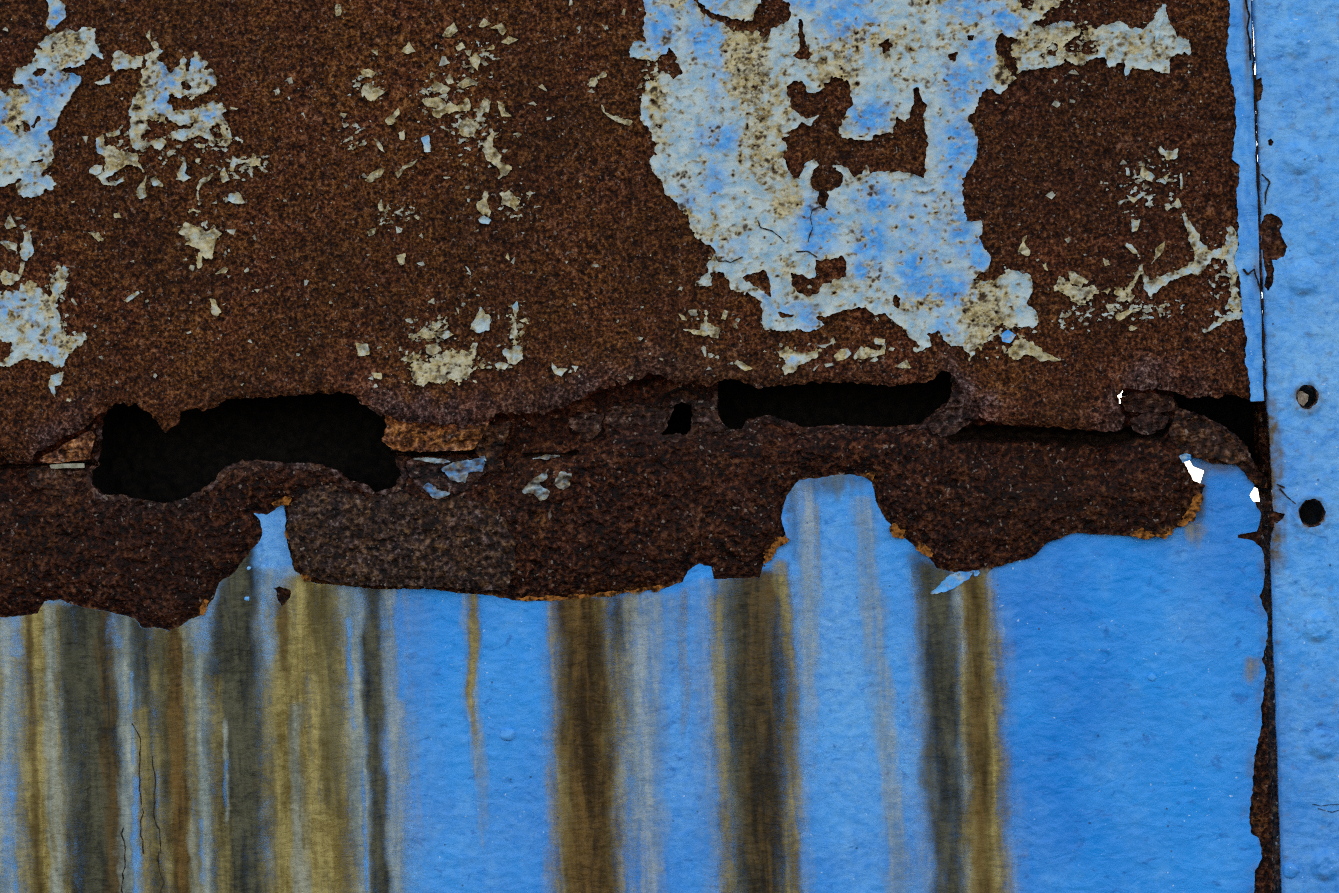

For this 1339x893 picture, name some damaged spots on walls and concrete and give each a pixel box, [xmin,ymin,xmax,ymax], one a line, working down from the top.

peeling [0,0,261,274]
peeling [361,69,385,101]
peeling [365,135,431,183]
peeling [421,18,520,224]
peeling [601,0,1287,401]
peeling [0,215,88,397]
peeling [403,301,529,387]
crack [0,461,100,470]
crack [389,449,478,457]
crack [521,450,578,458]
crack [946,423,1170,450]
corrosion [0,373,1281,893]